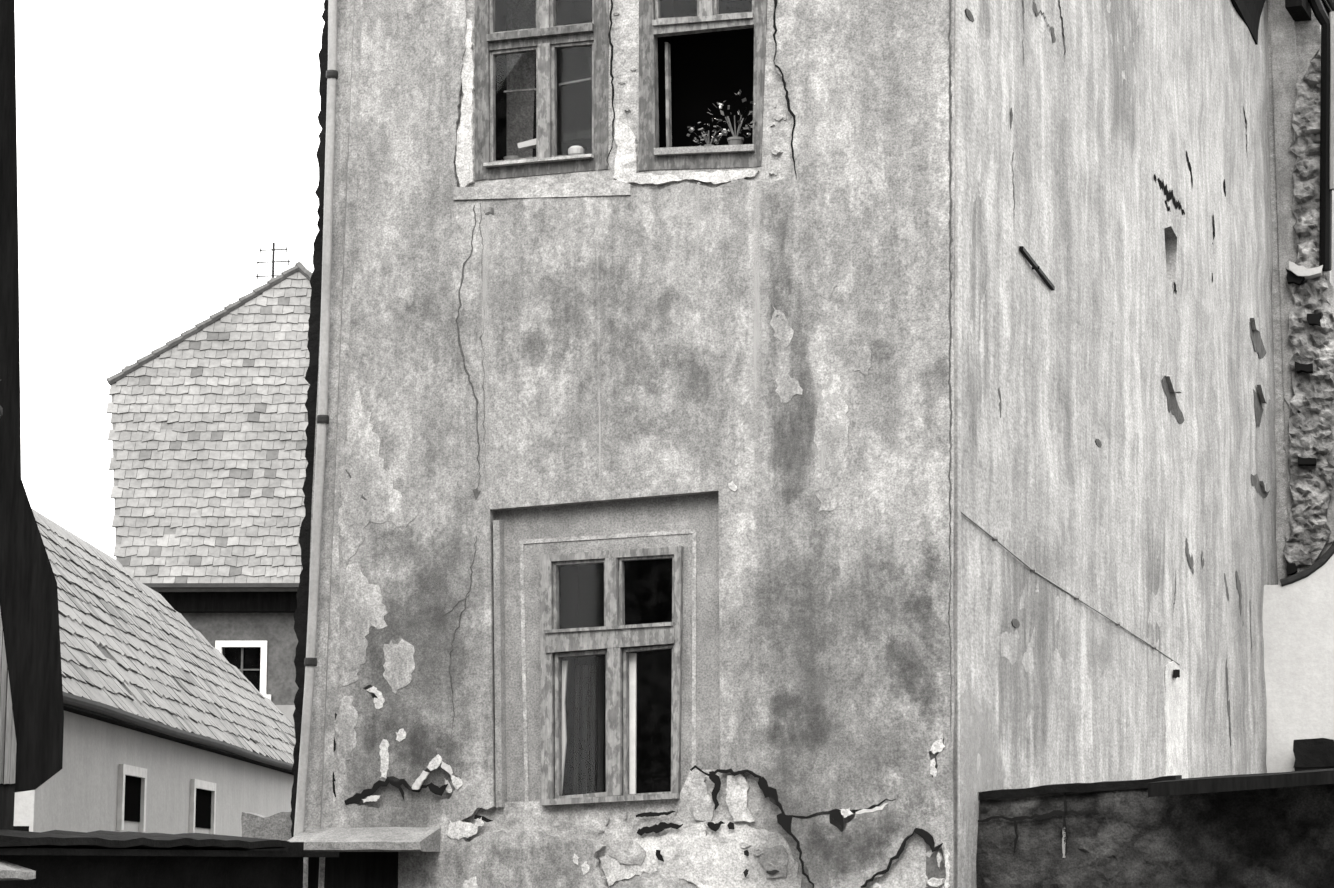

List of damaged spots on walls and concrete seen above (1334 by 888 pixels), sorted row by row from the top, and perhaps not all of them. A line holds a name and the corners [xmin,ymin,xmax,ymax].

peeling [455,18,475,187]
peeling [613,106,783,185]
crack [1008,108,1016,231]
crack [1022,0,1066,62]
crack [455,203,494,499]
crack [946,0,954,737]
flaking render [1249,49,1334,576]
peeling [334,389,418,774]
crack [441,535,477,737]
spalling [353,728,463,809]
spalling [447,769,812,888]
spalling [864,832,950,888]